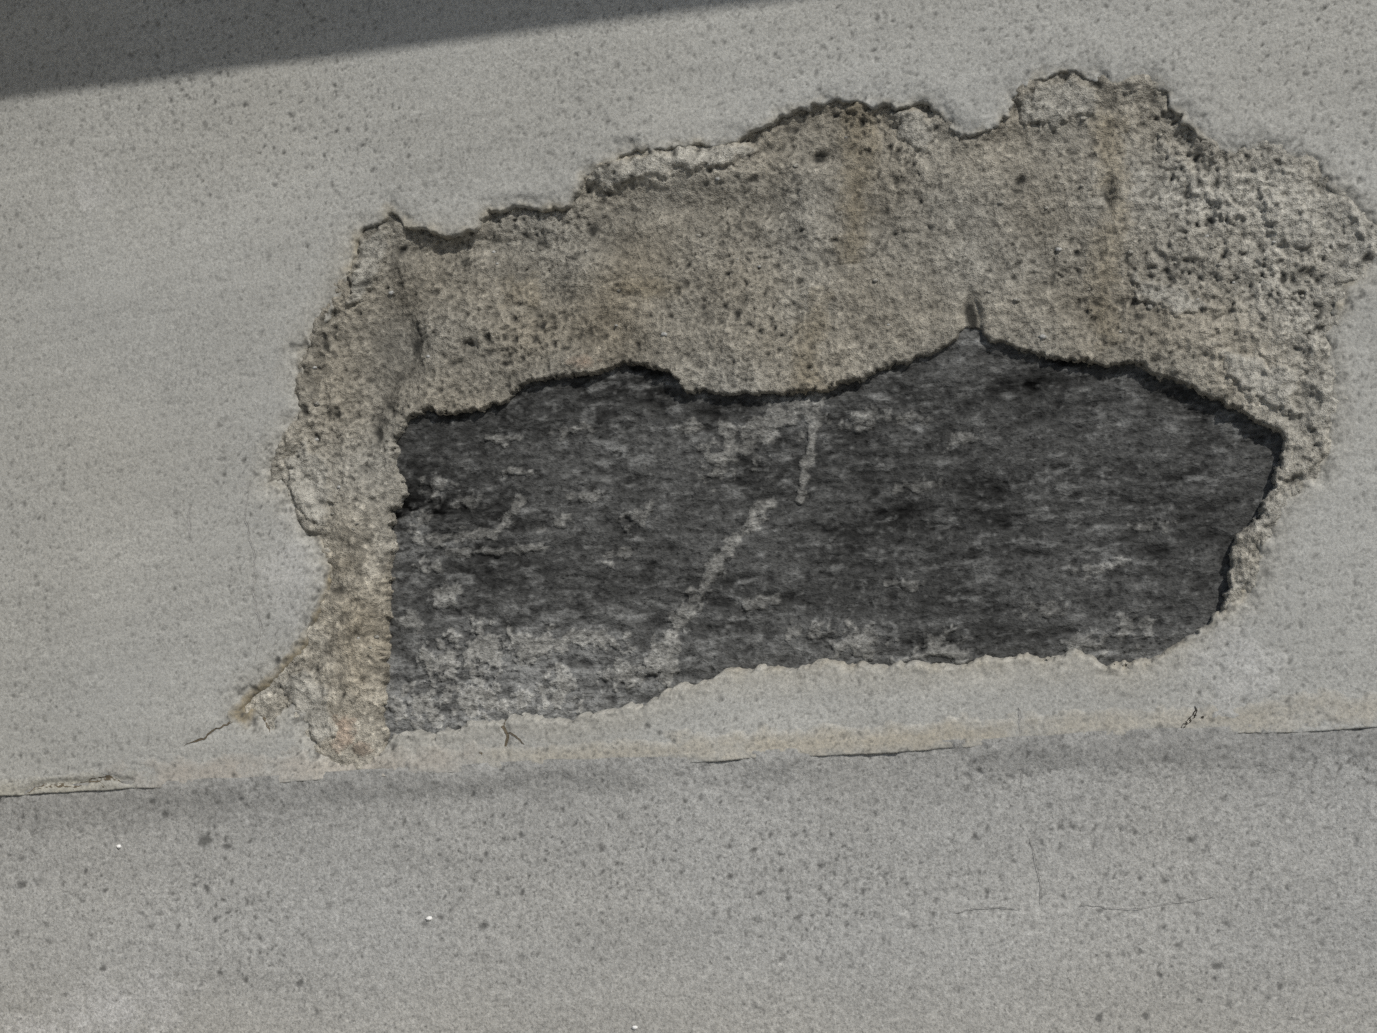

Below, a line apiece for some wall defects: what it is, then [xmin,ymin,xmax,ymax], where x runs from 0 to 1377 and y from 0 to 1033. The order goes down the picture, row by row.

flaking render [245,71,1377,770]
crack [1181,707,1204,728]
crack [479,719,524,754]
crack [28,775,121,793]
crack [958,842,1041,913]